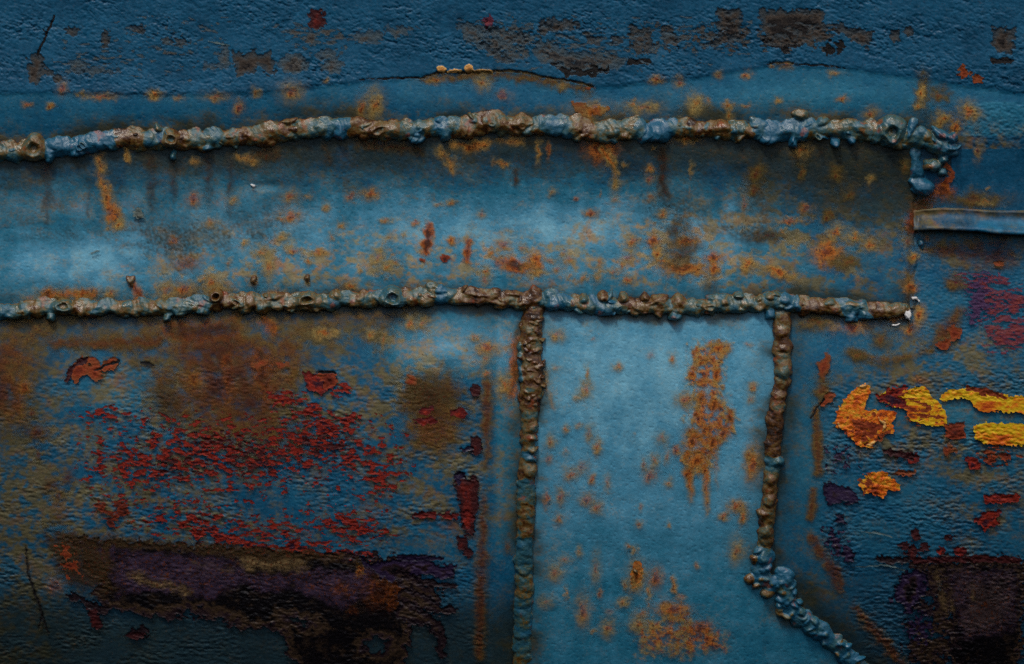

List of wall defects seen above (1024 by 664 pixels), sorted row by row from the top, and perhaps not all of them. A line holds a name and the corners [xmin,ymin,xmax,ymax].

crack [359,64,594,88]
peeling [456,7,875,78]
peeling [990,25,1017,64]
corrosion [96,155,124,230]
corrosion [411,220,472,264]
corrosion [482,142,722,284]
peeling [935,261,1024,354]
peeling [64,356,120,384]
corrosion [642,339,740,505]
peeling [45,371,483,664]
peeling [810,383,1024,564]
corrosion [618,544,724,659]